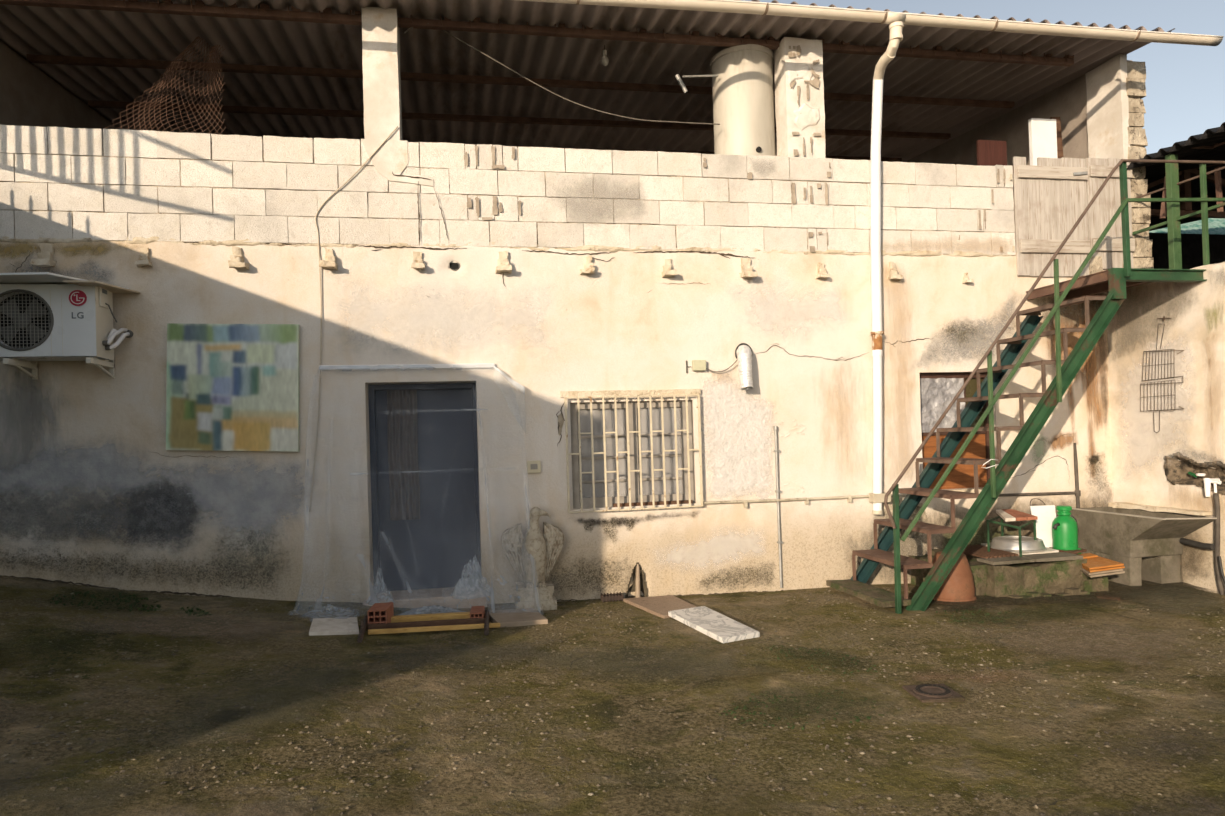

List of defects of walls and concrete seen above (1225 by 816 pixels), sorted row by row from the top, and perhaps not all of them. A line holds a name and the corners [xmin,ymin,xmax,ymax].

crack [756,338,933,361]
rust [1050,300,1098,367]
rust [1069,335,1107,476]
rust [1051,434,1074,449]
damp [0,387,302,588]
spalling [1163,452,1225,495]
damp [578,516,659,541]